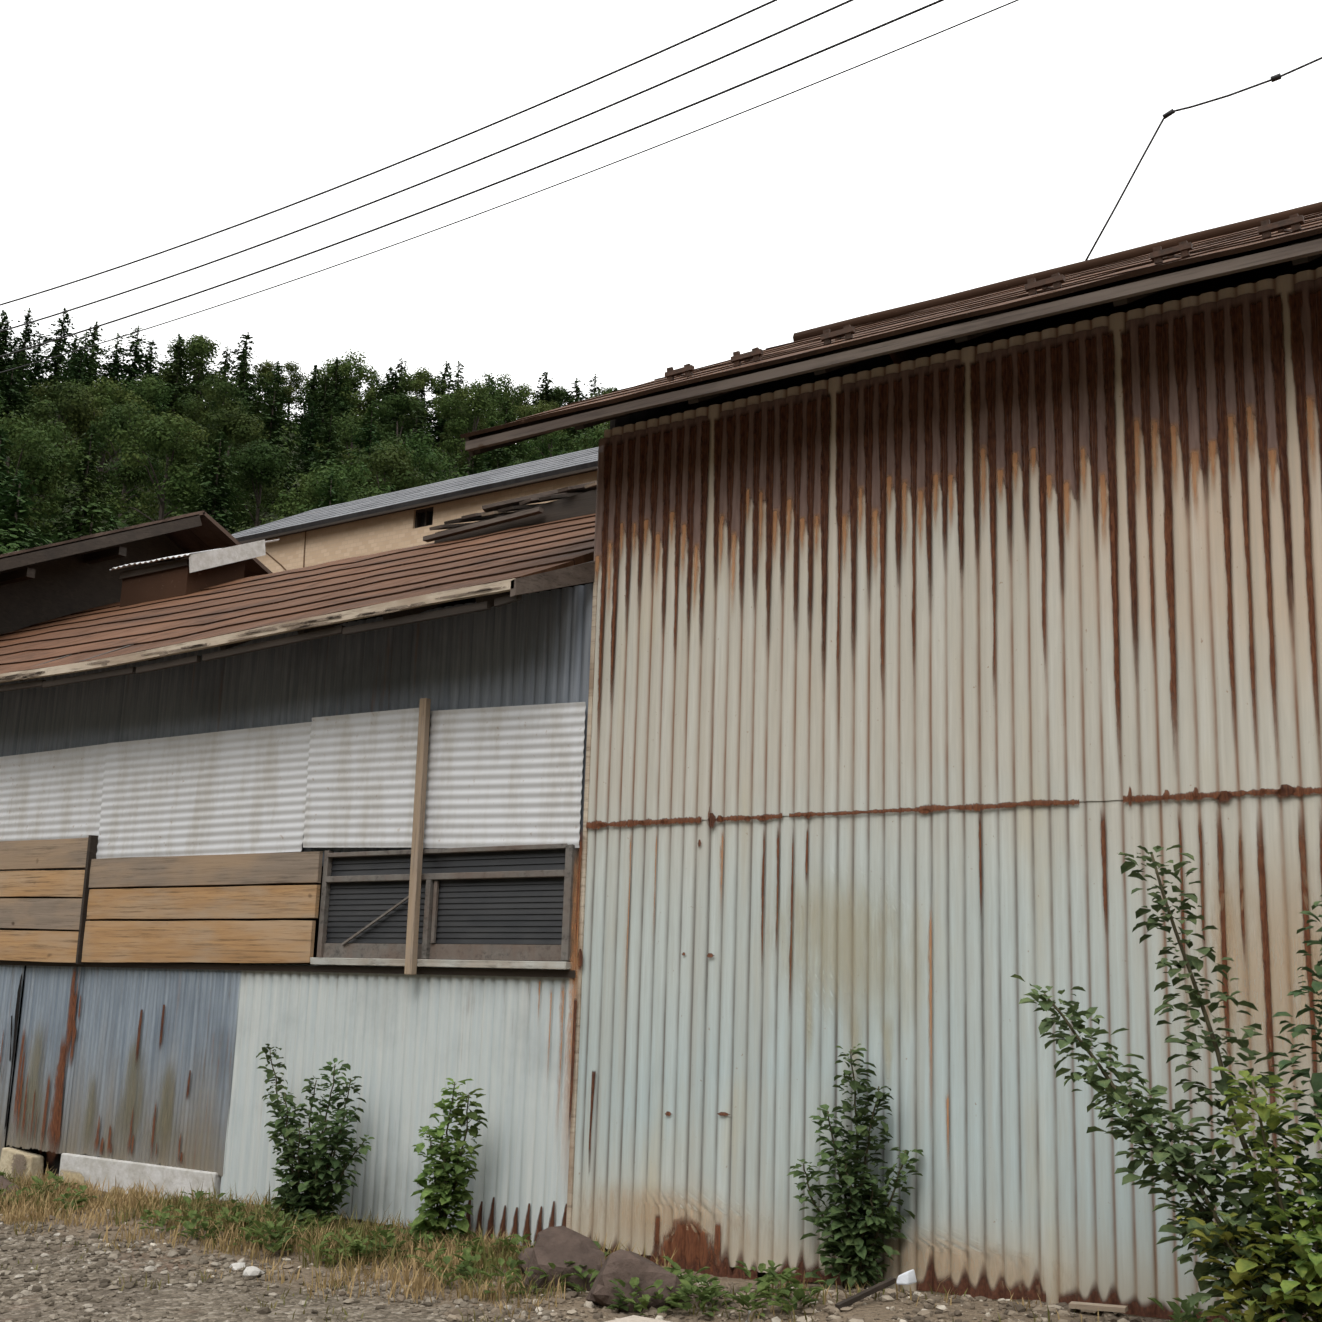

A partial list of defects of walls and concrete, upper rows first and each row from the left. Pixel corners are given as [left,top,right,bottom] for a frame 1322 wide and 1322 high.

corrosion [594,277,1322,734]
corrosion [1123,784,1322,806]
corrosion [527,799,1079,1123]
corrosion [1198,823,1274,1072]
corrosion [1298,824,1322,1073]
corrosion [0,967,81,1148]
corrosion [589,1216,758,1280]
corrosion [775,1254,845,1285]
corrosion [916,1257,1242,1322]